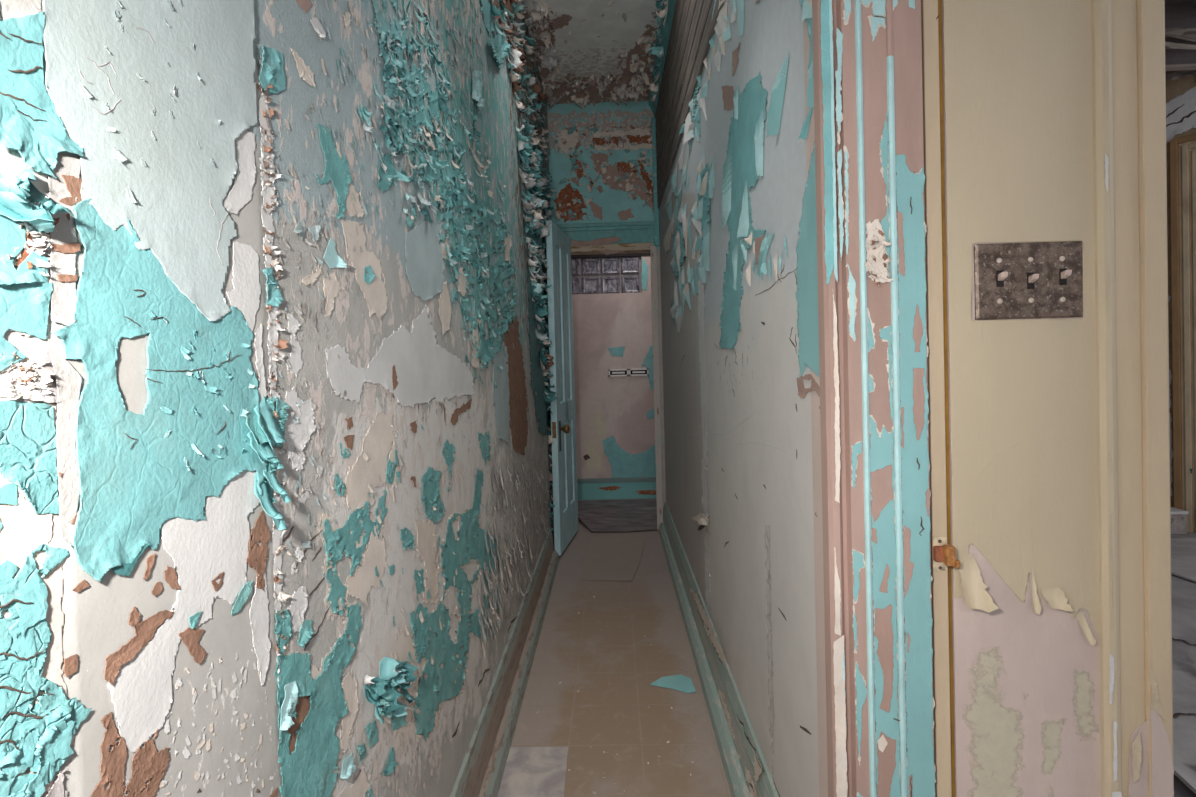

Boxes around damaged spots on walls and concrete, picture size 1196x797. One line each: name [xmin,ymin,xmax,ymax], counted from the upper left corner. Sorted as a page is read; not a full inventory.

peeling [0,0,936,797]